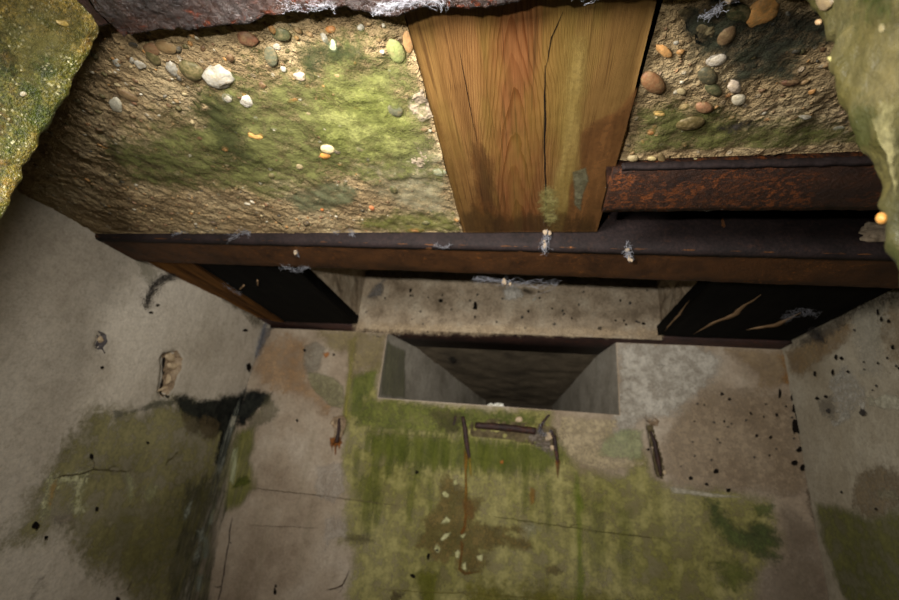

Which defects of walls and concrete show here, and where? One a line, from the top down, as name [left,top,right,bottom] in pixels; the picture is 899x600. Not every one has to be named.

crack [543,15,562,211]
leakage [40,472,88,523]
spalling [157,350,183,398]
leakage [135,301,899,600]